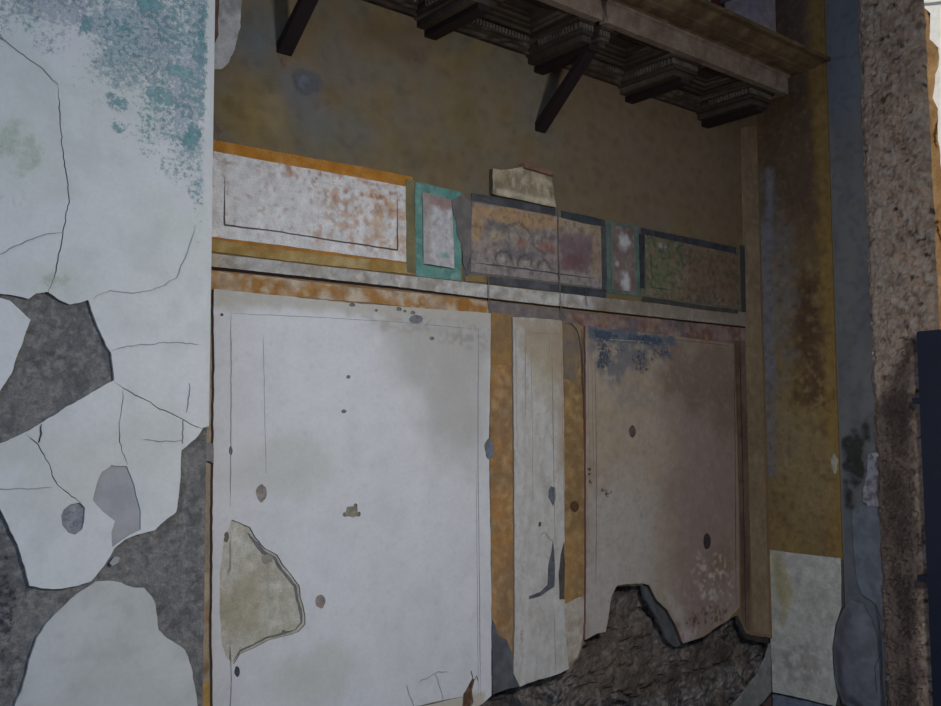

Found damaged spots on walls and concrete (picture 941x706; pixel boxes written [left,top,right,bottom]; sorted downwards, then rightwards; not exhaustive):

crack [0,37,70,295]
crack [930,108,938,147]
crack [101,230,195,294]
spalling [0,292,113,443]
crack [116,383,203,457]
crack [0,424,80,502]
leakage [842,423,870,508]
peeling [343,504,360,517]
spalling [0,427,207,706]
peeling [220,520,304,677]
peeling [529,543,565,599]
spalling [481,585,763,706]